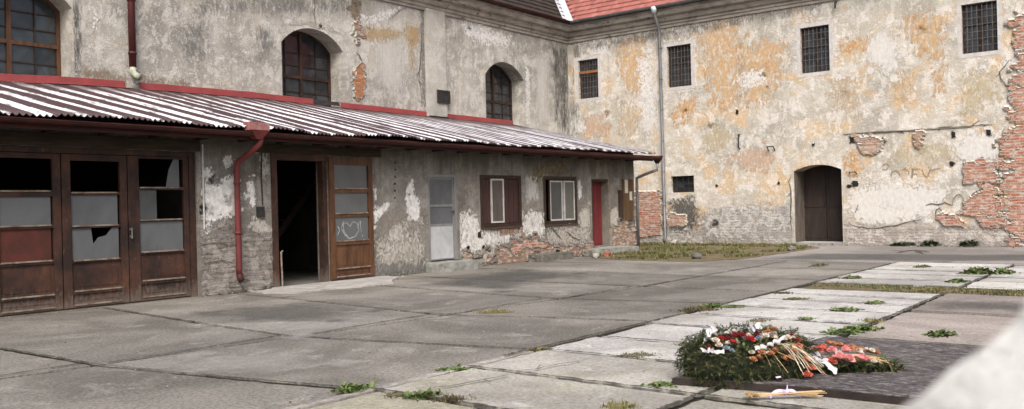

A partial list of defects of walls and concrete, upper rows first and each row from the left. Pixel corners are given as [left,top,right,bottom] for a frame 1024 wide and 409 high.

spalling [279,0,402,102]
peeling [843,5,1024,246]
spalling [199,152,274,296]
peeling [365,162,429,278]
flaking render [459,180,596,266]
spalling [609,189,792,246]